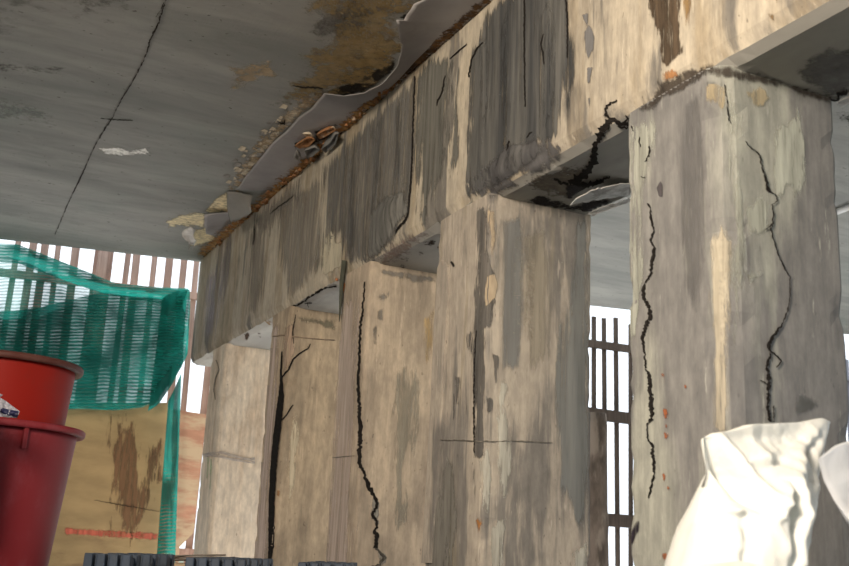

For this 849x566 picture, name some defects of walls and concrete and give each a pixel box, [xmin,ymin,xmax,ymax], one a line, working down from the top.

corrosion [198,139,326,259]
crack [268,286,337,559]
flaking render [166,0,491,251]
damp [247,77,432,309]
damp [285,0,419,104]
crack [332,282,387,566]
corrosion [337,0,491,138]
peeling [485,275,498,306]
damp [466,207,522,509]
damp [466,0,574,198]
crack [553,100,650,189]
crack [640,203,656,498]